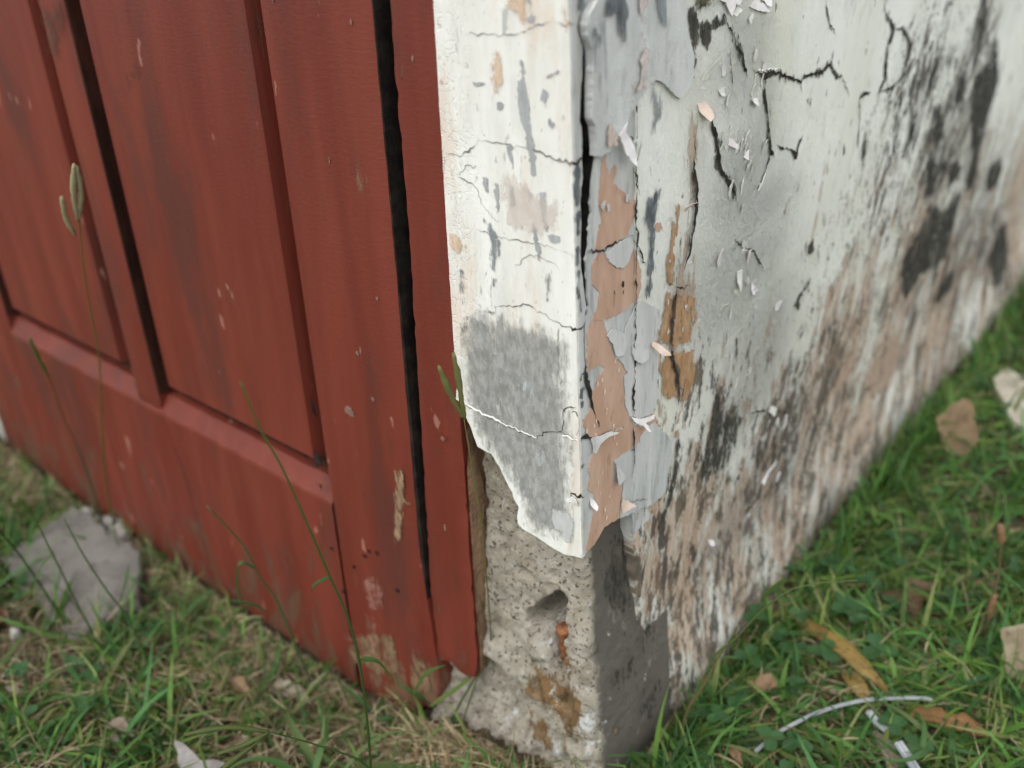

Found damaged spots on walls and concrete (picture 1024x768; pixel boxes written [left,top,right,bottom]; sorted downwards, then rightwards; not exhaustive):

damp [688,0,726,66]
crack [443,0,646,503]
damp [573,165,582,312]
damp [646,188,661,298]
peeling [697,103,714,122]
crack [667,4,911,405]
damp [795,0,1008,349]
peeling [567,122,698,558]
damp [461,311,582,534]
damp [692,373,770,488]
spalling [555,621,568,661]
rust [558,686,579,737]